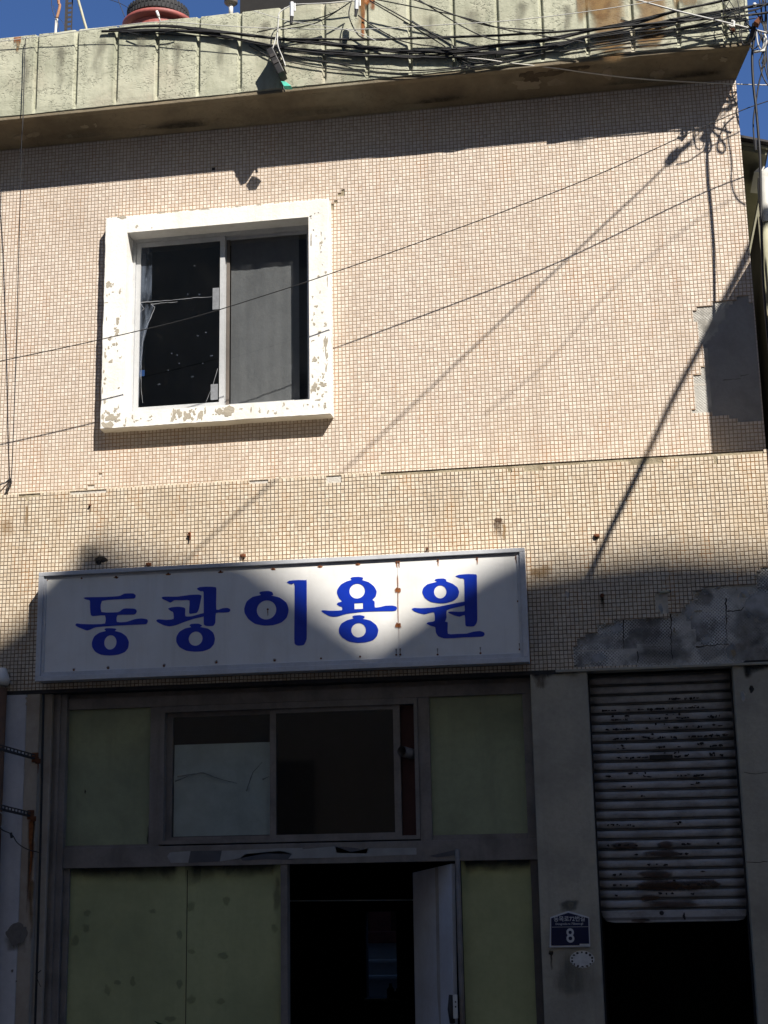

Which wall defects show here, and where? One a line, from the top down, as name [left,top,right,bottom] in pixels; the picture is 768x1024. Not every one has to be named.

peeling [101,316,152,428]
peeling [171,402,289,422]
spalling [572,568,768,667]
rust [638,870,720,908]